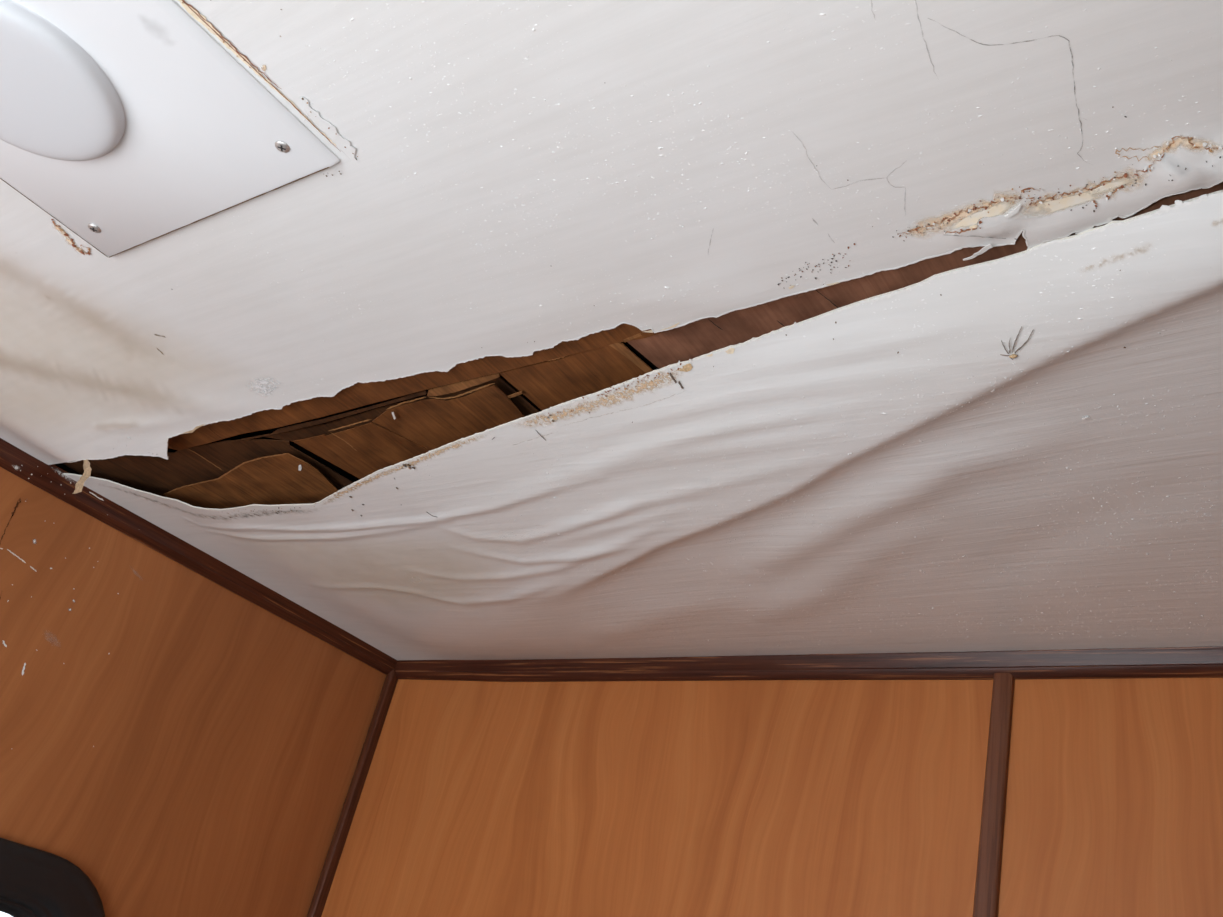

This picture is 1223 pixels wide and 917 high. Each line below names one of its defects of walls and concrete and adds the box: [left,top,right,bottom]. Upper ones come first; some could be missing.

peeling [896,135,1223,258]